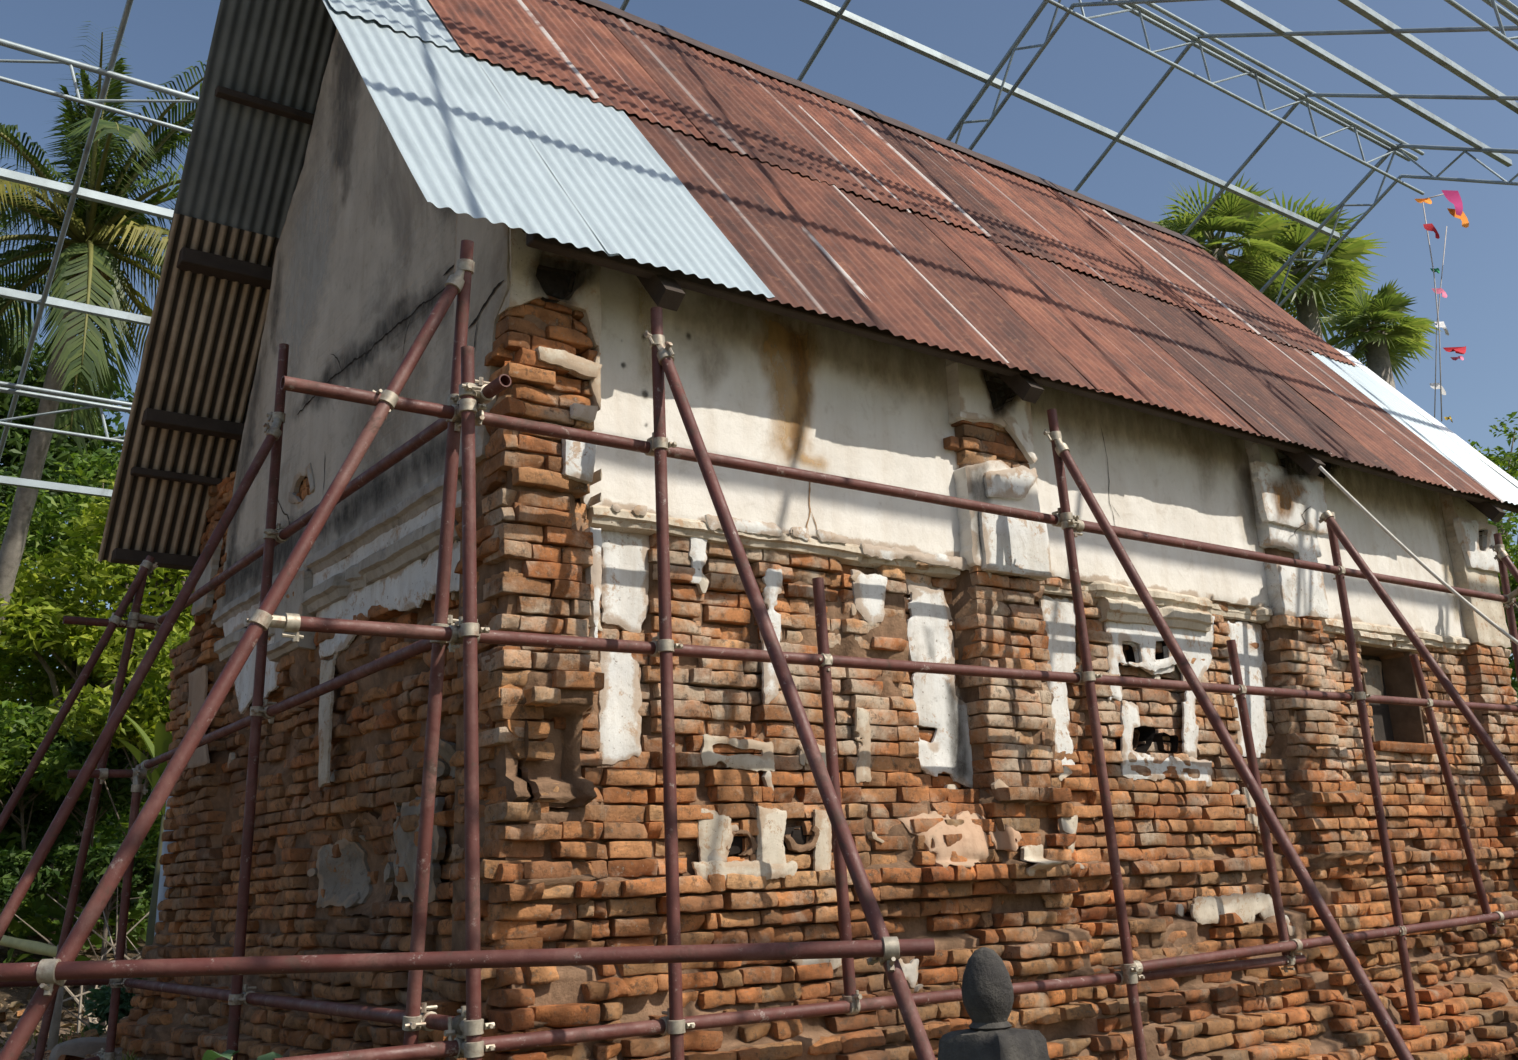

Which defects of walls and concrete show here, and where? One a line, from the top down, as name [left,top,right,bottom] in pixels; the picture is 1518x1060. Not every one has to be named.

water stain [335,35,359,167]
crack [297,265,454,415]
crack [468,280,504,347]
spalling [483,256,602,500]
rust [763,320,822,466]
peeling [316,541,460,787]
peeling [479,504,650,808]
peeling [688,514,992,790]
peeling [1039,595,1080,781]
peeling [1104,616,1268,787]
peeling [692,806,832,882]
peeling [1175,892,1296,936]